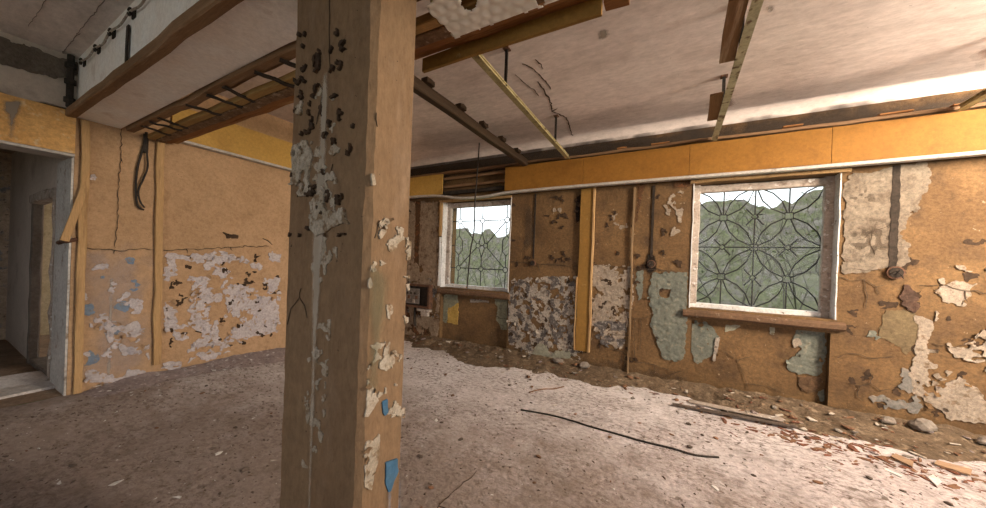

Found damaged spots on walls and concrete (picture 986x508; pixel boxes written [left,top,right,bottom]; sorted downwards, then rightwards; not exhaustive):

spalling [0,36,78,79]
crack [516,59,573,136]
spalling [288,28,355,283]
spalling [841,162,932,274]
peeling [83,282,150,386]
peeling [161,250,281,370]
peeling [364,341,405,418]
peeling [367,196,586,361]
peeling [591,250,740,364]
peeling [786,330,827,376]
peeling [867,265,986,424]
peeling [364,434,380,490]